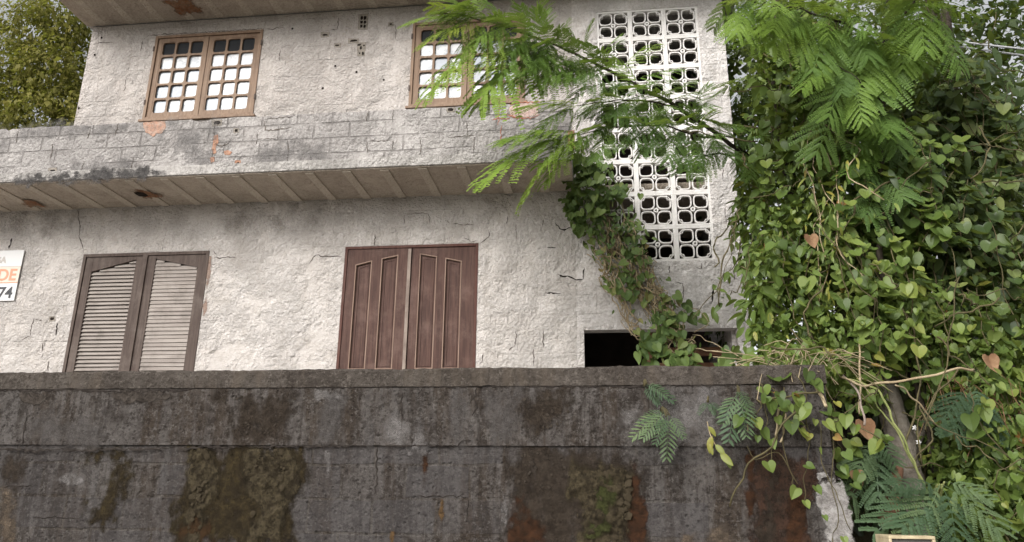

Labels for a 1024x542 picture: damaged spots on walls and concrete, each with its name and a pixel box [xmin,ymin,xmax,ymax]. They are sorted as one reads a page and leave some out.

damp [2,160,165,188]
spalling [143,121,166,137]
spalling [210,120,241,163]
crack [545,268,585,294]
damp [182,445,220,542]
damp [240,445,301,542]
rust [626,464,648,542]
rust [739,447,820,542]